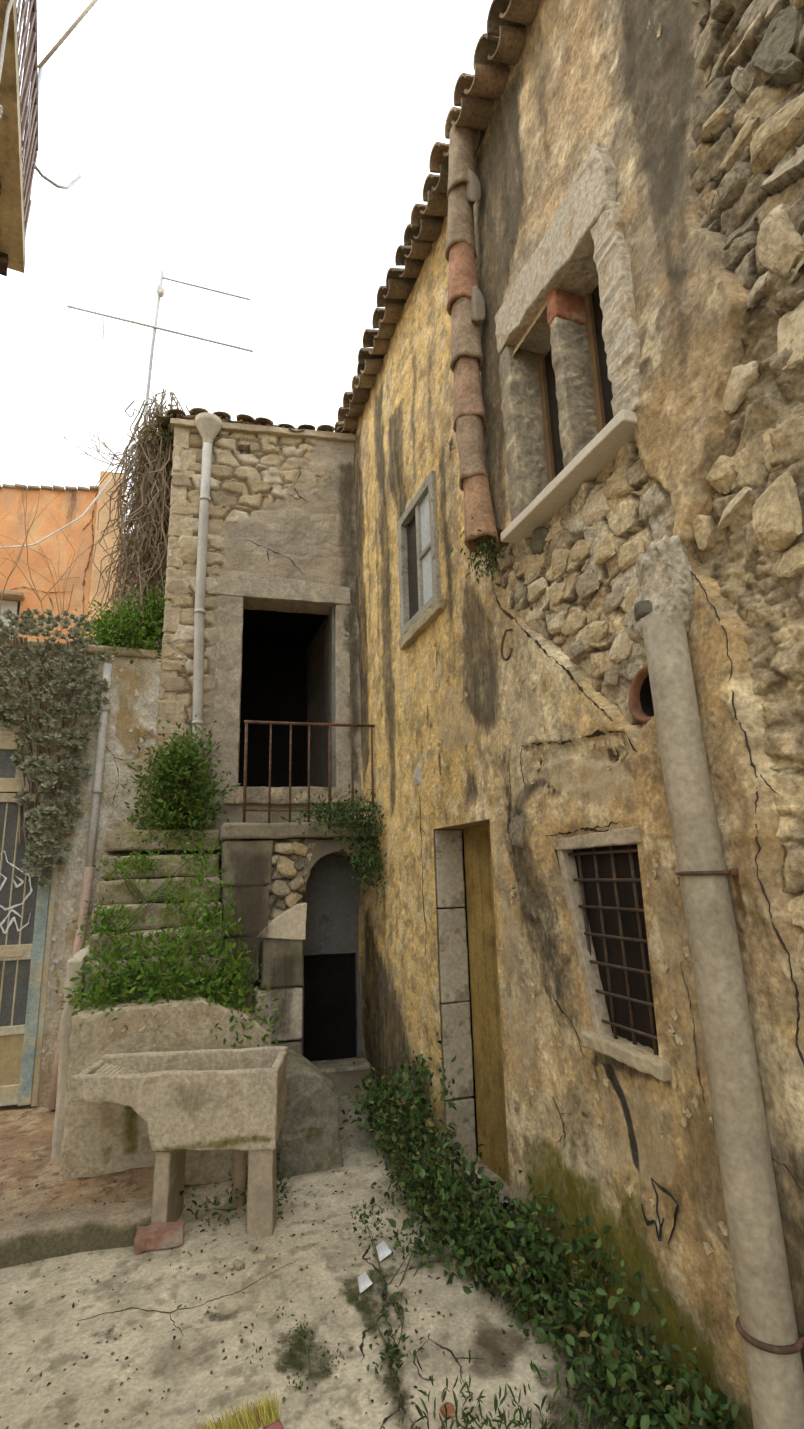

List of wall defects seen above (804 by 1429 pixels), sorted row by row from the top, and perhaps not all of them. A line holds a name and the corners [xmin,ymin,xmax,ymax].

water stain [622,0,695,291]
crack [487,556,637,907]
spalling [496,441,676,804]
spalling [687,0,804,970]
crack [690,571,804,1066]
crack [77,1261,296,1335]